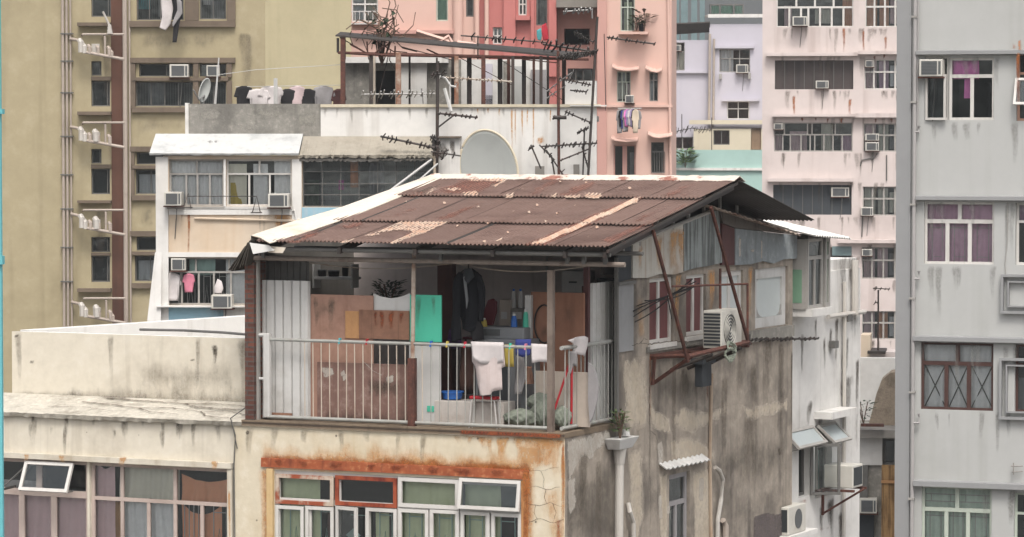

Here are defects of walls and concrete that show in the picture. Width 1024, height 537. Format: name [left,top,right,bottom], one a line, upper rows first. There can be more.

damp [824,320,859,405]
corrosion [263,430,565,537]
crack [528,467,564,523]